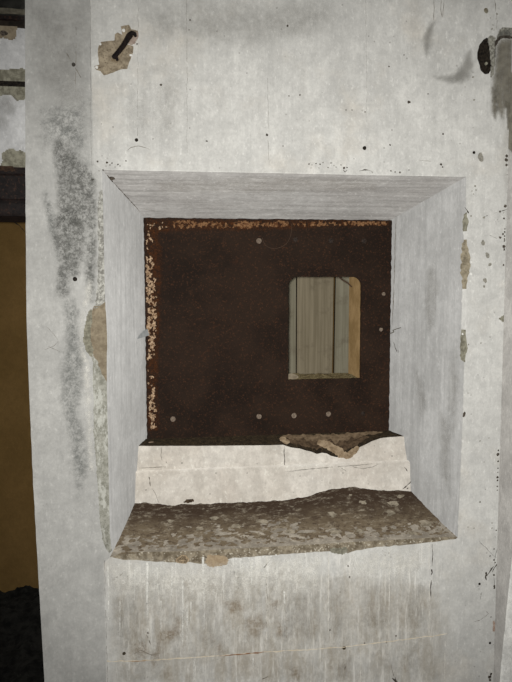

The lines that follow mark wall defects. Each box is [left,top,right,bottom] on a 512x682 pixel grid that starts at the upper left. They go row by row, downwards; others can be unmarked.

spalling [94,25,139,75]
leakage [493,31,512,151]
leakage [55,142,95,294]
spalling [460,239,472,289]
leakage [83,309,94,376]
corrosion [147,220,189,430]
spalling [90,190,457,568]
spalling [460,329,469,362]